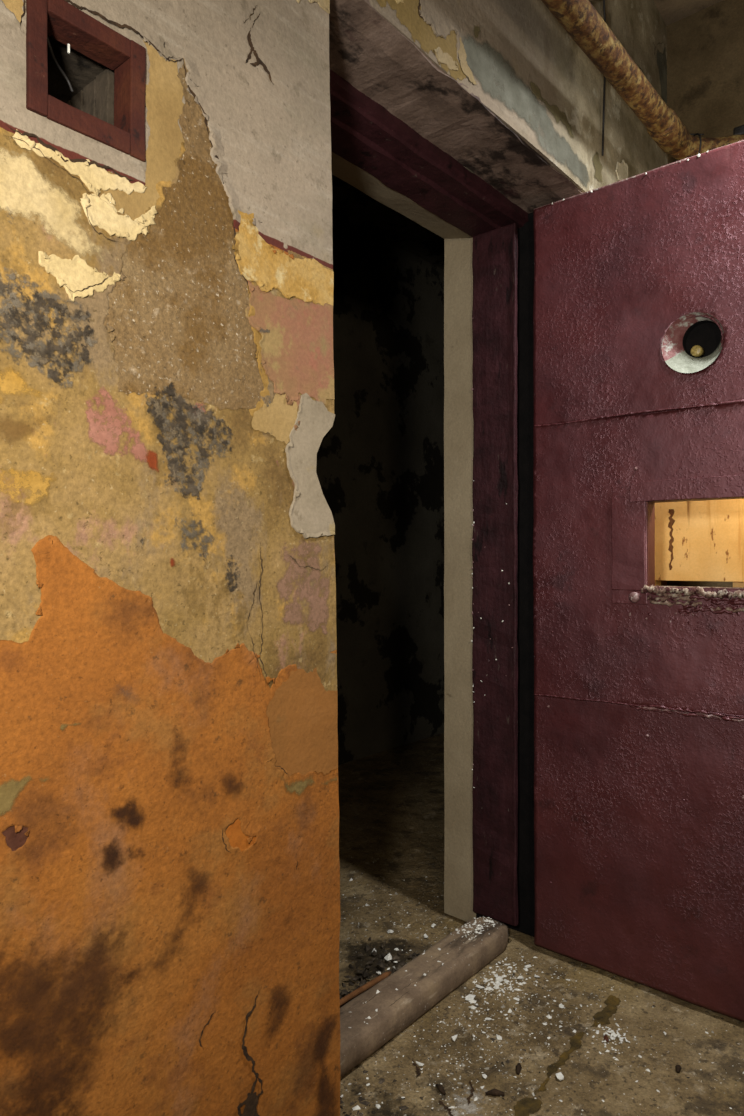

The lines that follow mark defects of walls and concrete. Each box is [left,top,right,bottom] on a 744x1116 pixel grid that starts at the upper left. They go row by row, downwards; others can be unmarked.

peeling [0,0,26,44]
crack [244,5,273,83]
peeling [296,0,330,13]
peeling [377,0,593,193]
water stain [0,267,97,387]
peeling [0,24,338,794]
water stain [145,383,232,561]
water stain [225,555,240,592]
water stain [114,801,143,827]
crack [237,989,263,1116]
water stain [315,1020,335,1116]